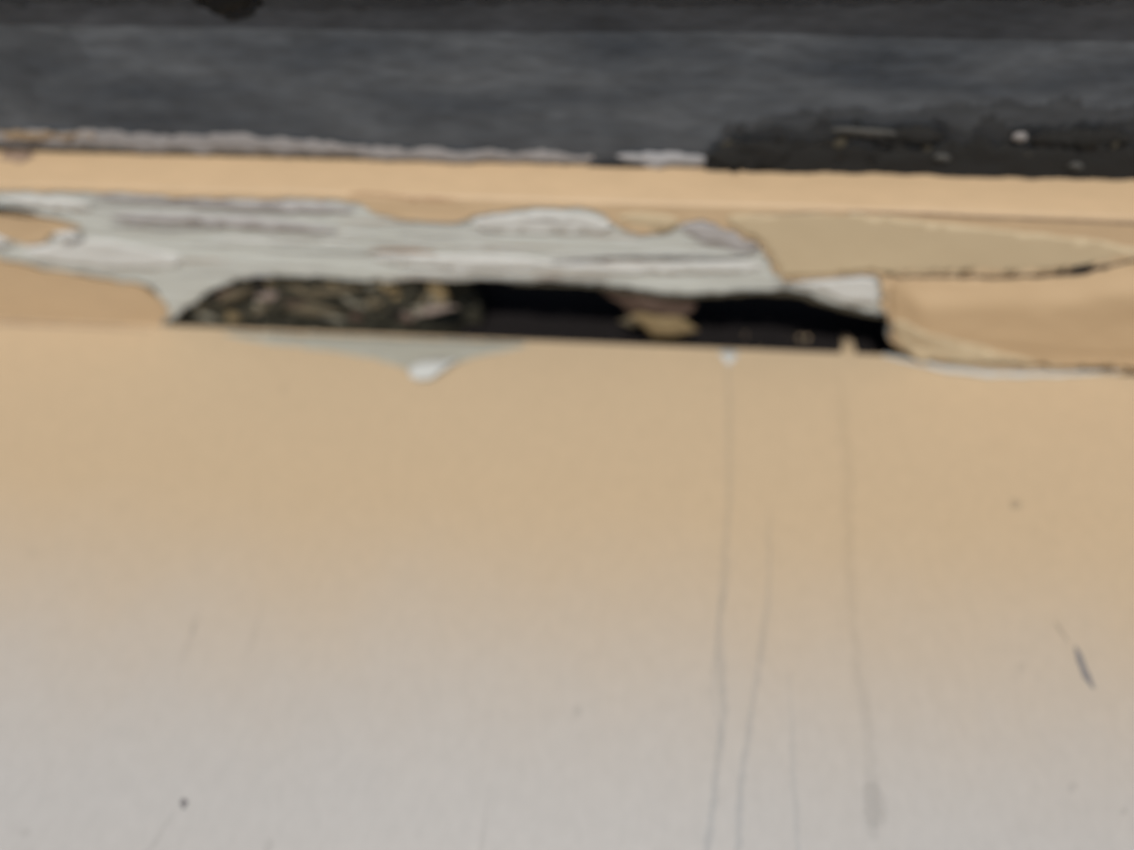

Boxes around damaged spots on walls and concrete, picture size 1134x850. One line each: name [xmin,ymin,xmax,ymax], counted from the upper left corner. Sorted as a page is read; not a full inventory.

peeling [0,191,1134,379]